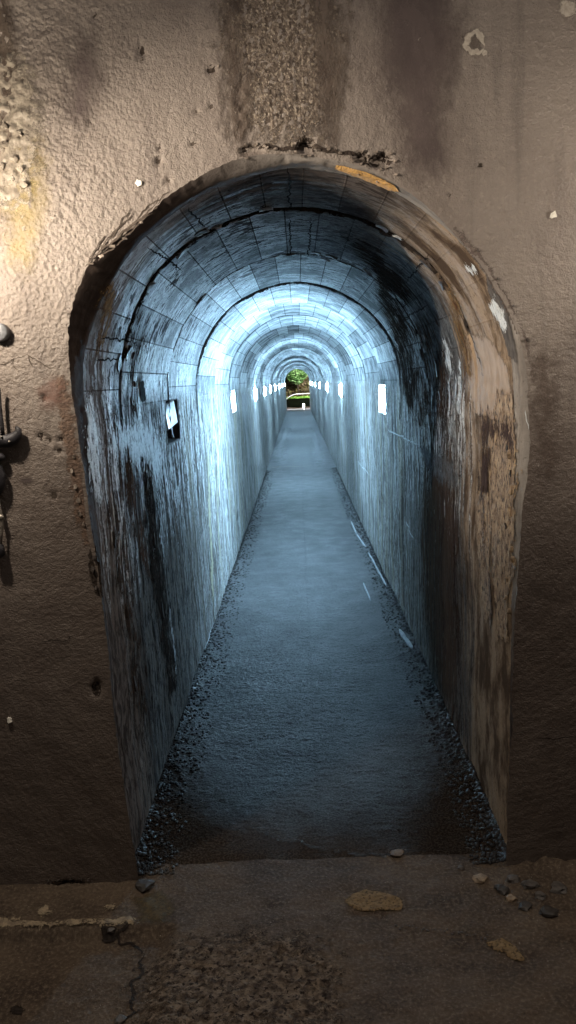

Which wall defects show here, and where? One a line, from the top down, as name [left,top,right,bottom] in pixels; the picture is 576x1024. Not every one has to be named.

water stain [465,264,517,363]
water stain [82,391,166,561]
spalling [117,207,523,644]
water stain [418,333,480,737]
water stain [477,443,492,503]
crack [116,919,145,1024]